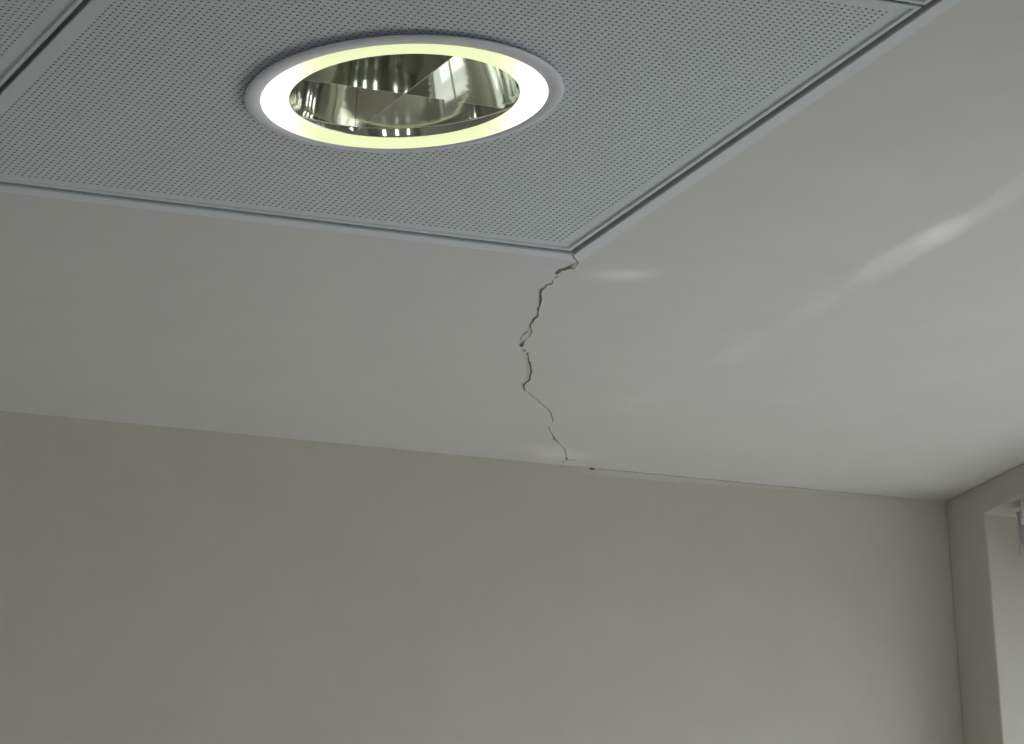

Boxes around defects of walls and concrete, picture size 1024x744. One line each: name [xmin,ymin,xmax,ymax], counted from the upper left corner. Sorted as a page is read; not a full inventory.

crack [520,255,579,462]